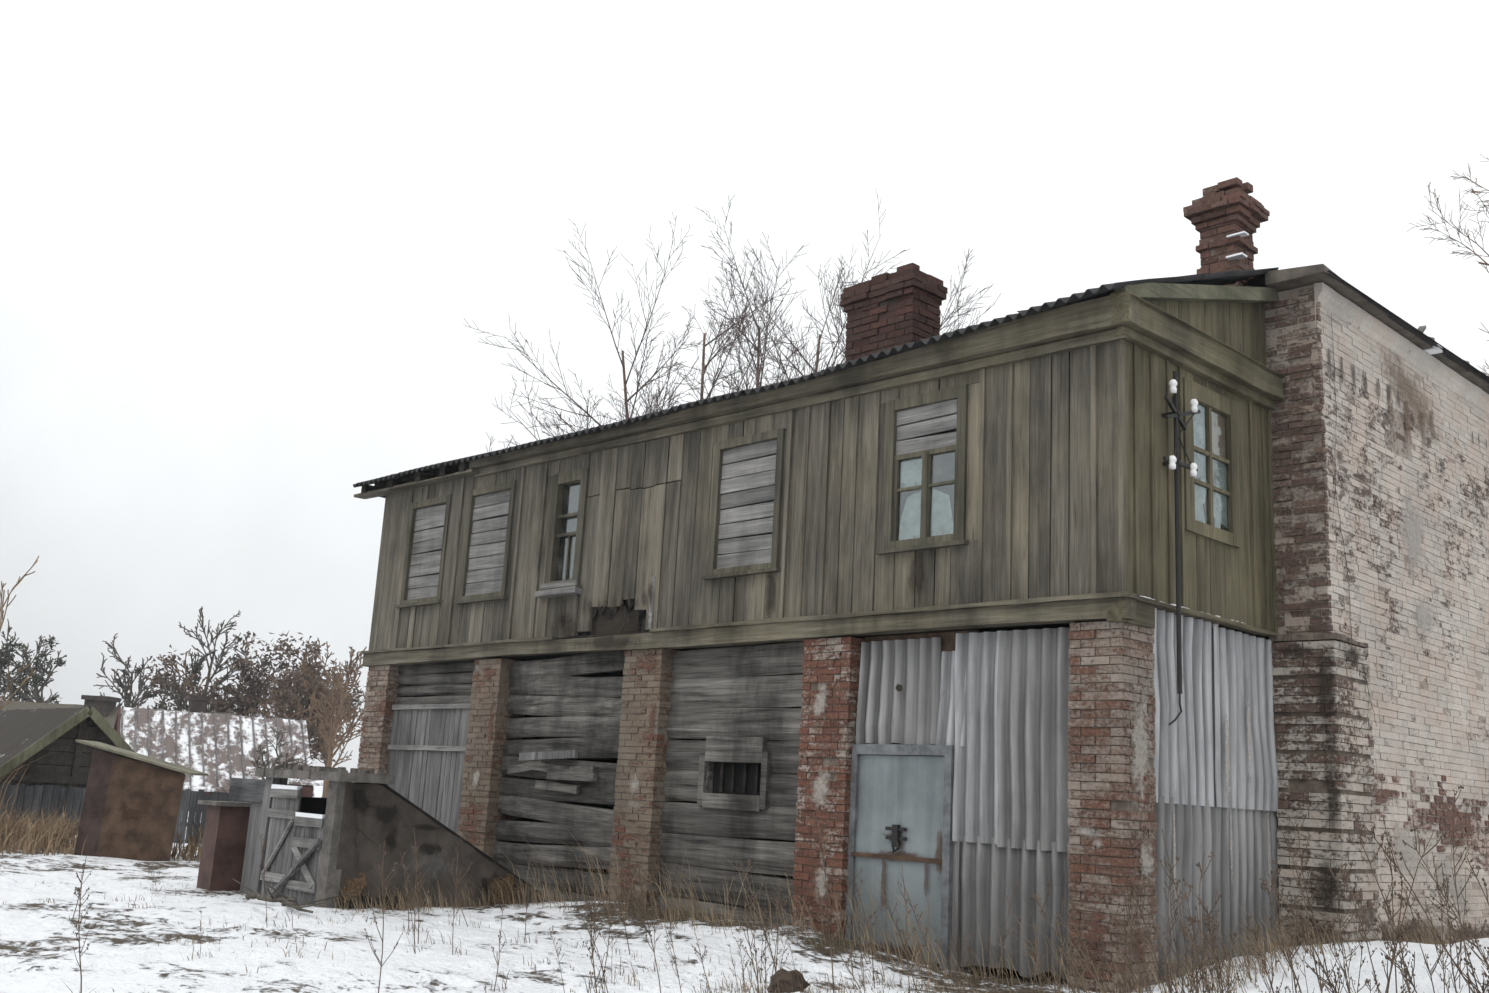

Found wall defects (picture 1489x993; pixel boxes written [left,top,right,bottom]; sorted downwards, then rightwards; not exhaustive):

peeling [1337,403,1381,583]
peeling [1400,409,1466,490]
spalling [1372,771,1489,871]